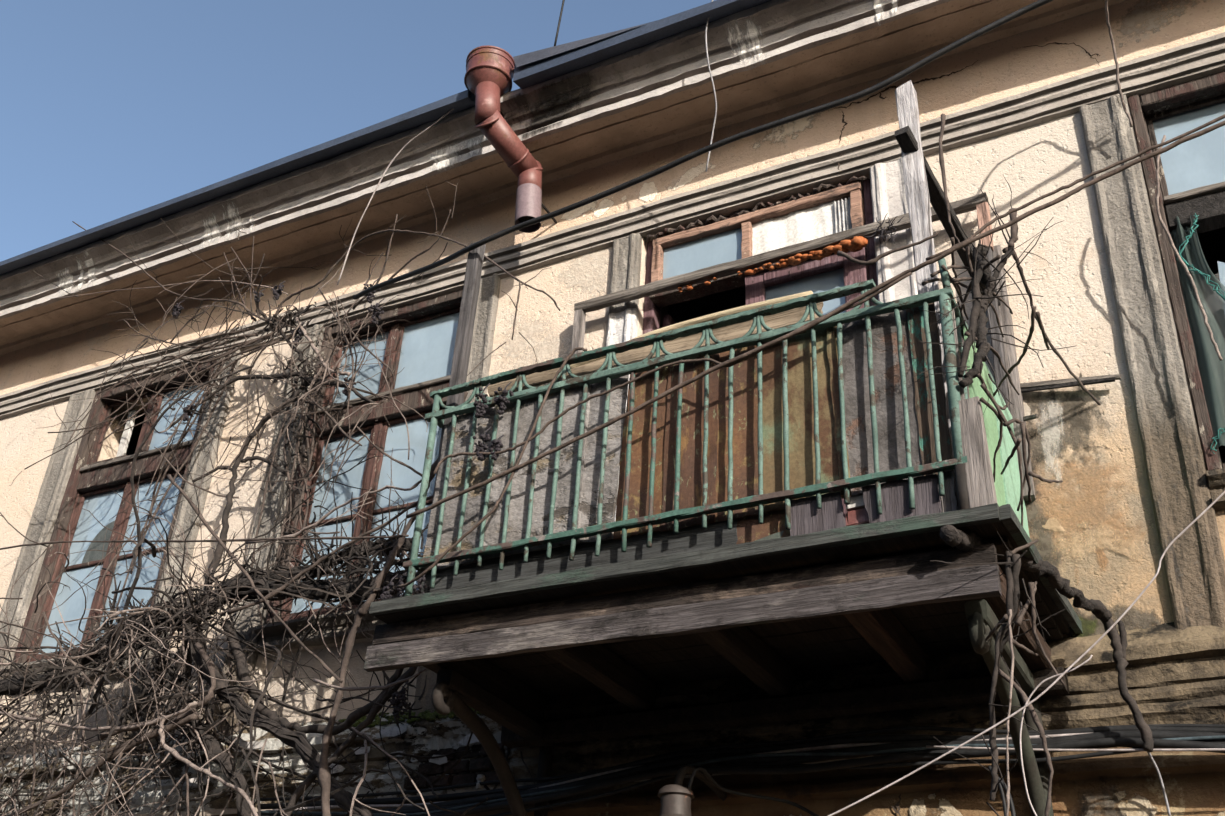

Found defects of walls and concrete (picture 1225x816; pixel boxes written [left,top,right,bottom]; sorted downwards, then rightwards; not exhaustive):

crack [1020,42,1100,66]
damp [1025,373,1100,567]
damp [1069,604,1161,637]
peeling [909,793,963,816]
peeling [1114,791,1157,816]